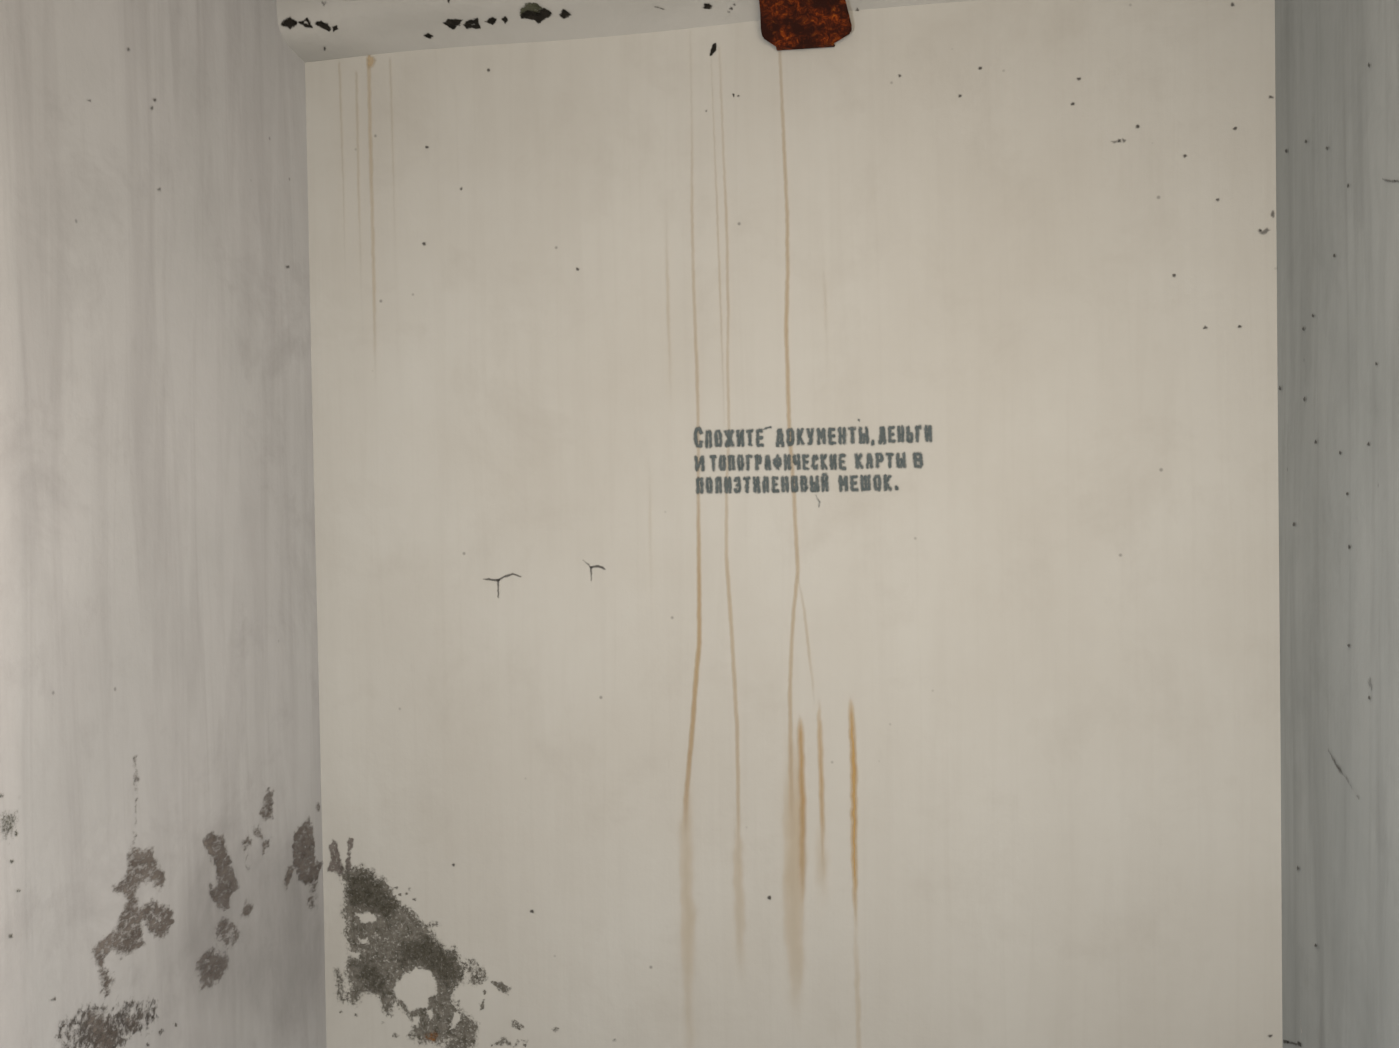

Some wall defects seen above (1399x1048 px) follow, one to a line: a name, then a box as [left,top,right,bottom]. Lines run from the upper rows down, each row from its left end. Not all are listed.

flaking render [328,838,526,1048]